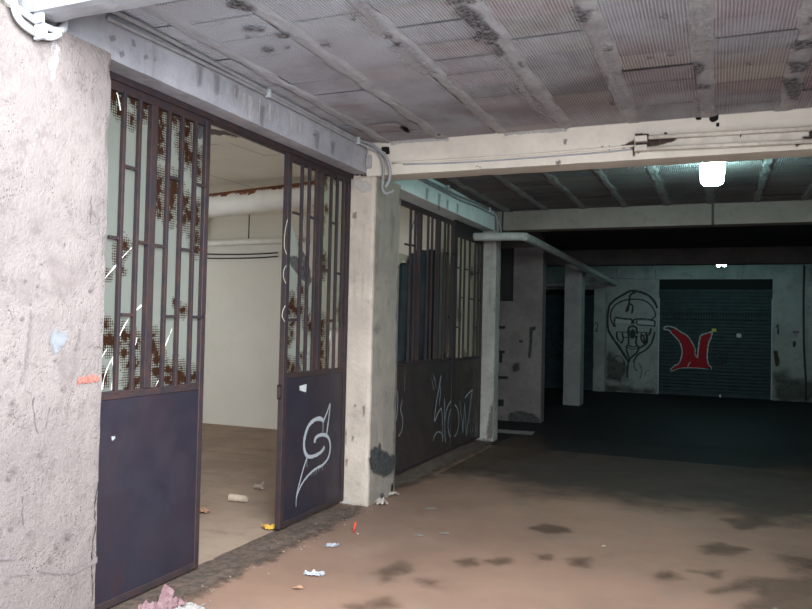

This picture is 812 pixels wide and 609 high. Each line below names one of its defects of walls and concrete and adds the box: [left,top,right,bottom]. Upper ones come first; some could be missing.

rust [209,181,315,197]